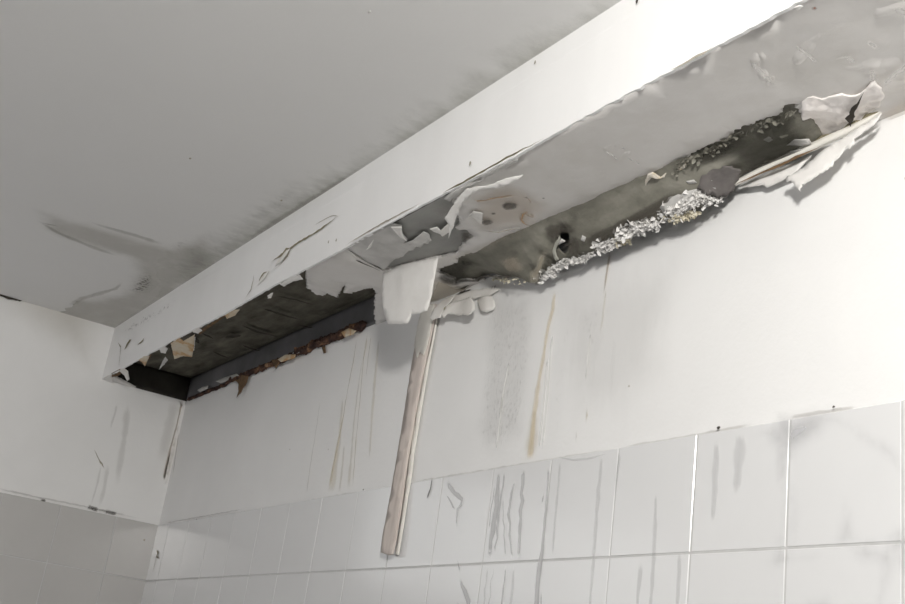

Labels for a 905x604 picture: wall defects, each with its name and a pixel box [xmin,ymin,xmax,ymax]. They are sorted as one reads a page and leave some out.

rust [187,320,367,401]
spalling [103,104,822,401]